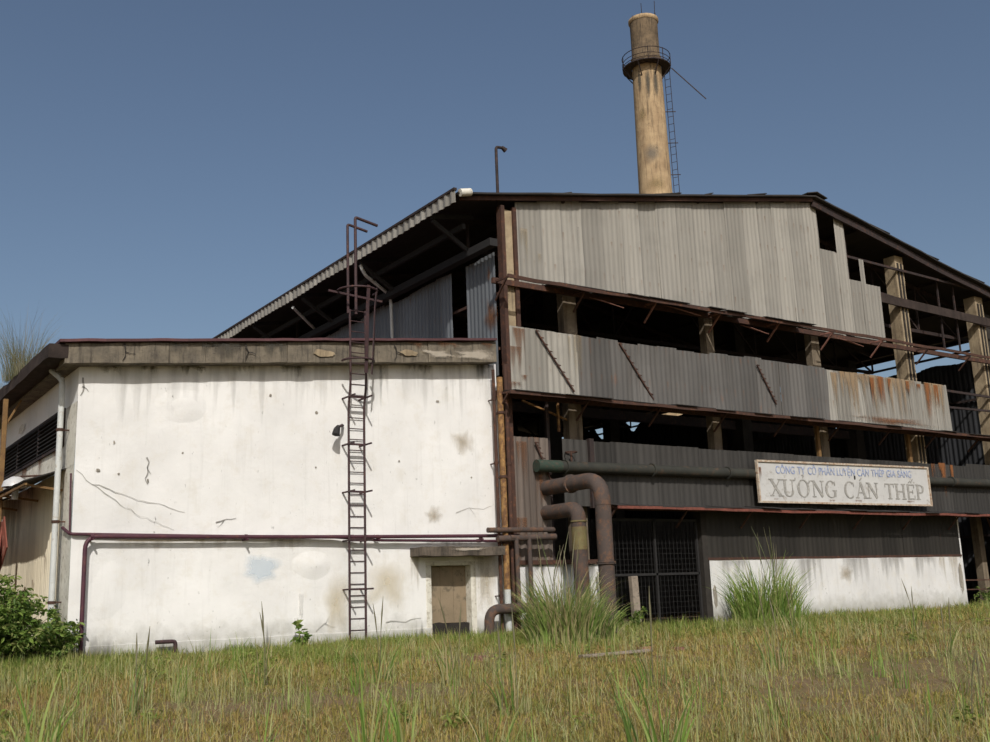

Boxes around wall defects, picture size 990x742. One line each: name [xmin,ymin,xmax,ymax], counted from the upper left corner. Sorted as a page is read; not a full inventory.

spalling [314,349,335,357]
spalling [401,349,491,359]
rust [830,371,943,408]
crack [77,457,182,527]